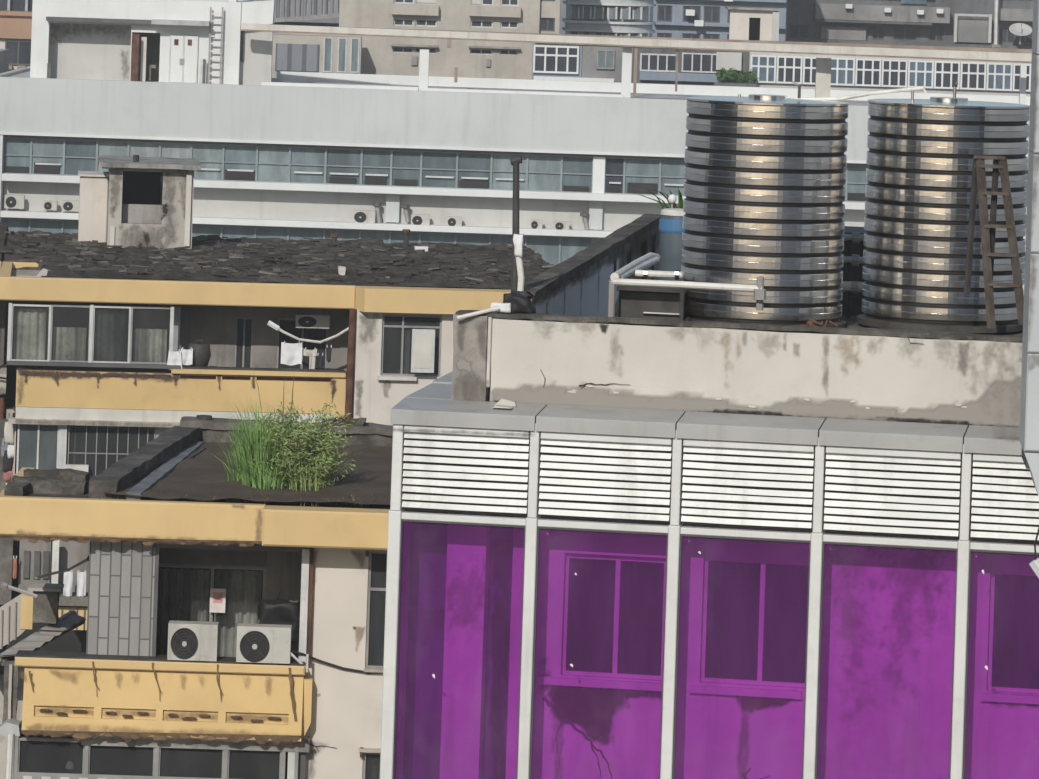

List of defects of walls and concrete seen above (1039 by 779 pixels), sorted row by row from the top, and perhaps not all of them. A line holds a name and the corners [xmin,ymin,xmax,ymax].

peeling [19,369,180,386]
leakage [888,418,969,427]
crack [543,697,612,779]
leakage [549,685,662,744]